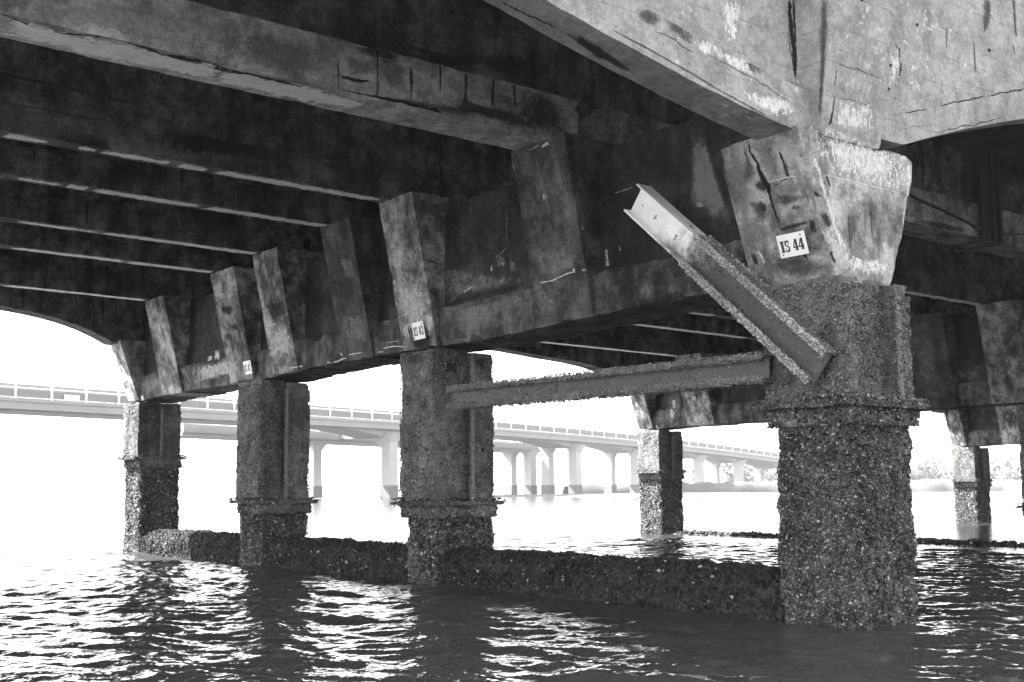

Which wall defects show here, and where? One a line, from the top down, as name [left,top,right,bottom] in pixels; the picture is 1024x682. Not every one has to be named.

crack [1,13,313,90]
crack [341,75,443,114]
crack [616,0,797,117]
leakage [742,82,800,116]
crack [892,86,1024,133]
crack [748,143,780,224]